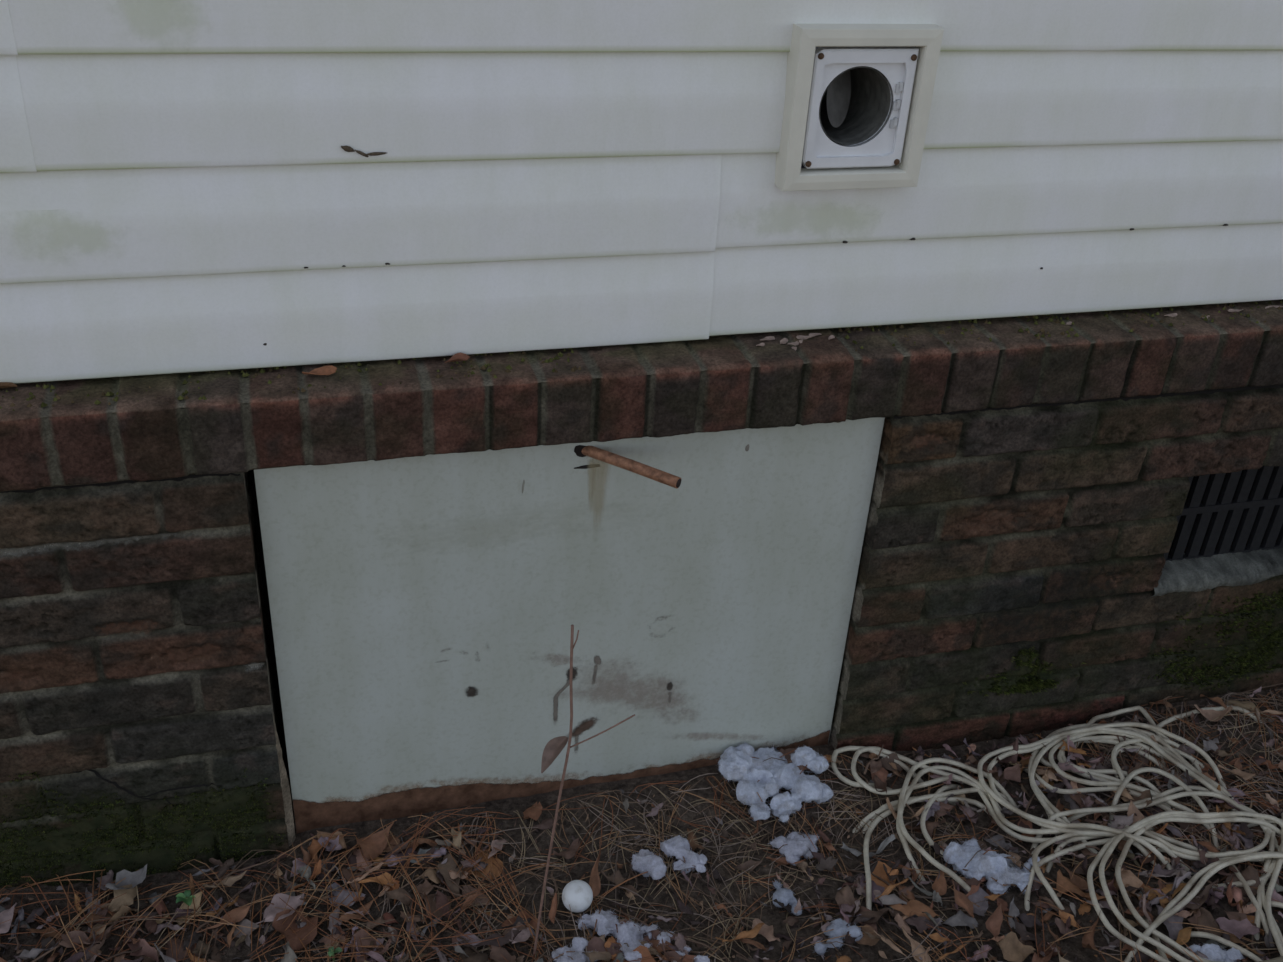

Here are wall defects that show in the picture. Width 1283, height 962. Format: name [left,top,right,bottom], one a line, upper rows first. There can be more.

rust [775,730,830,752]
rust [293,756,720,834]